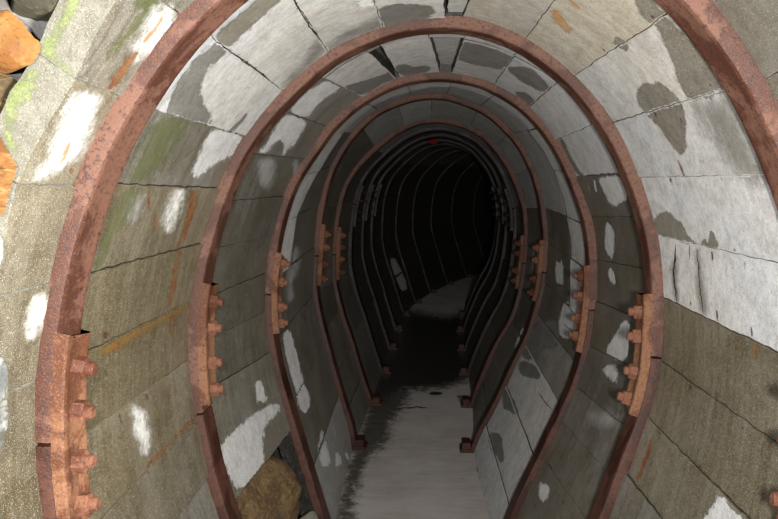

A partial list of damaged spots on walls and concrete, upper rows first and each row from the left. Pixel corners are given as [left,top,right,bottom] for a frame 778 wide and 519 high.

rust [552,10,572,32]
damp [458,40,549,104]
damp [635,0,754,172]
damp [654,212,718,248]
rust [101,191,197,355]
crack [673,244,703,311]